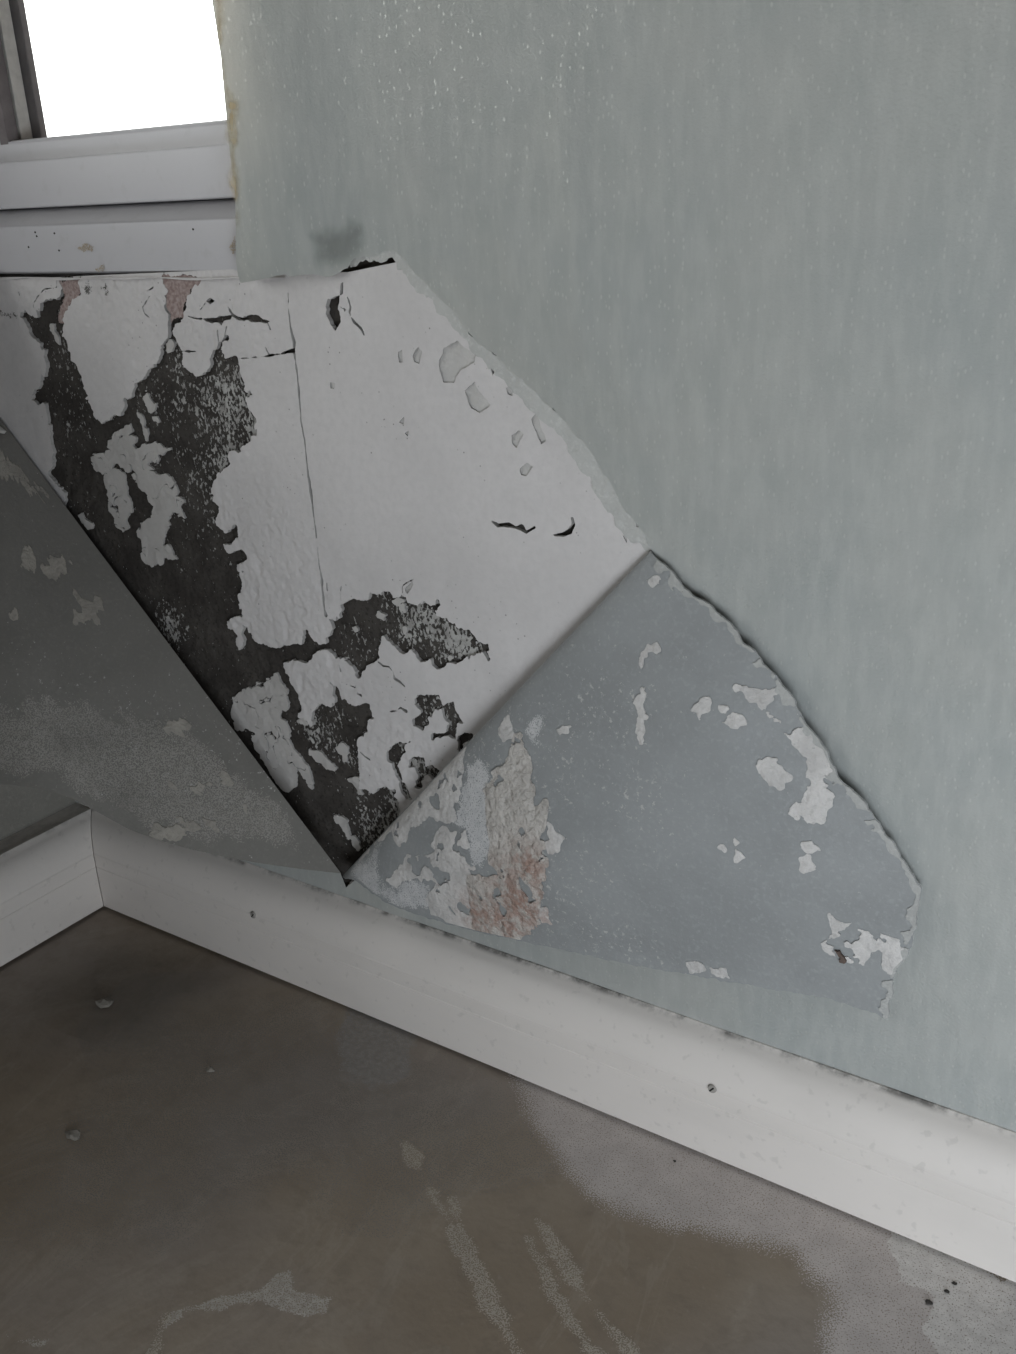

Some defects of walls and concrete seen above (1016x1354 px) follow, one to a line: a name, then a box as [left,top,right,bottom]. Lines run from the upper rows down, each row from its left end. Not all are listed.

crack [268,348,295,356]
spalling [23,275,490,887]
water stain [145,1270,333,1354]
water stain [400,1140,524,1354]
water stain [505,1073,1016,1354]